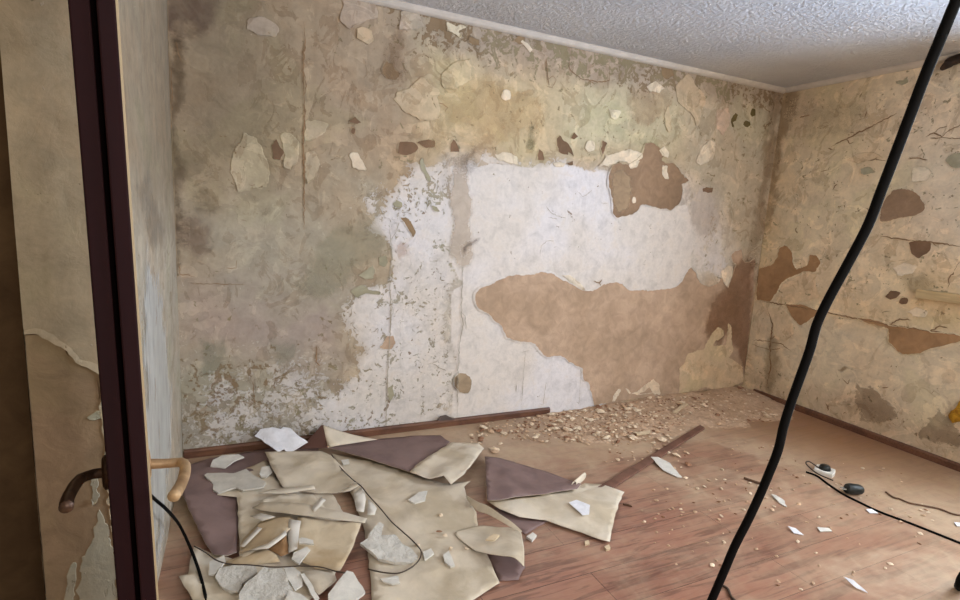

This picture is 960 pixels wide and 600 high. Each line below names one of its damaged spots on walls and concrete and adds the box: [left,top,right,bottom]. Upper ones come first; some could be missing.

peeling [381,59,472,121]
crack [300,28,308,224]
peeling [349,152,366,170]
spalling [392,199,416,238]
spalling [397,138,436,182]
spalling [536,132,689,219]
crack [800,111,895,189]
spalling [879,167,932,223]
spalling [473,245,822,406]
spalling [856,290,960,356]
spalling [453,372,473,394]
spalling [255,427,308,452]